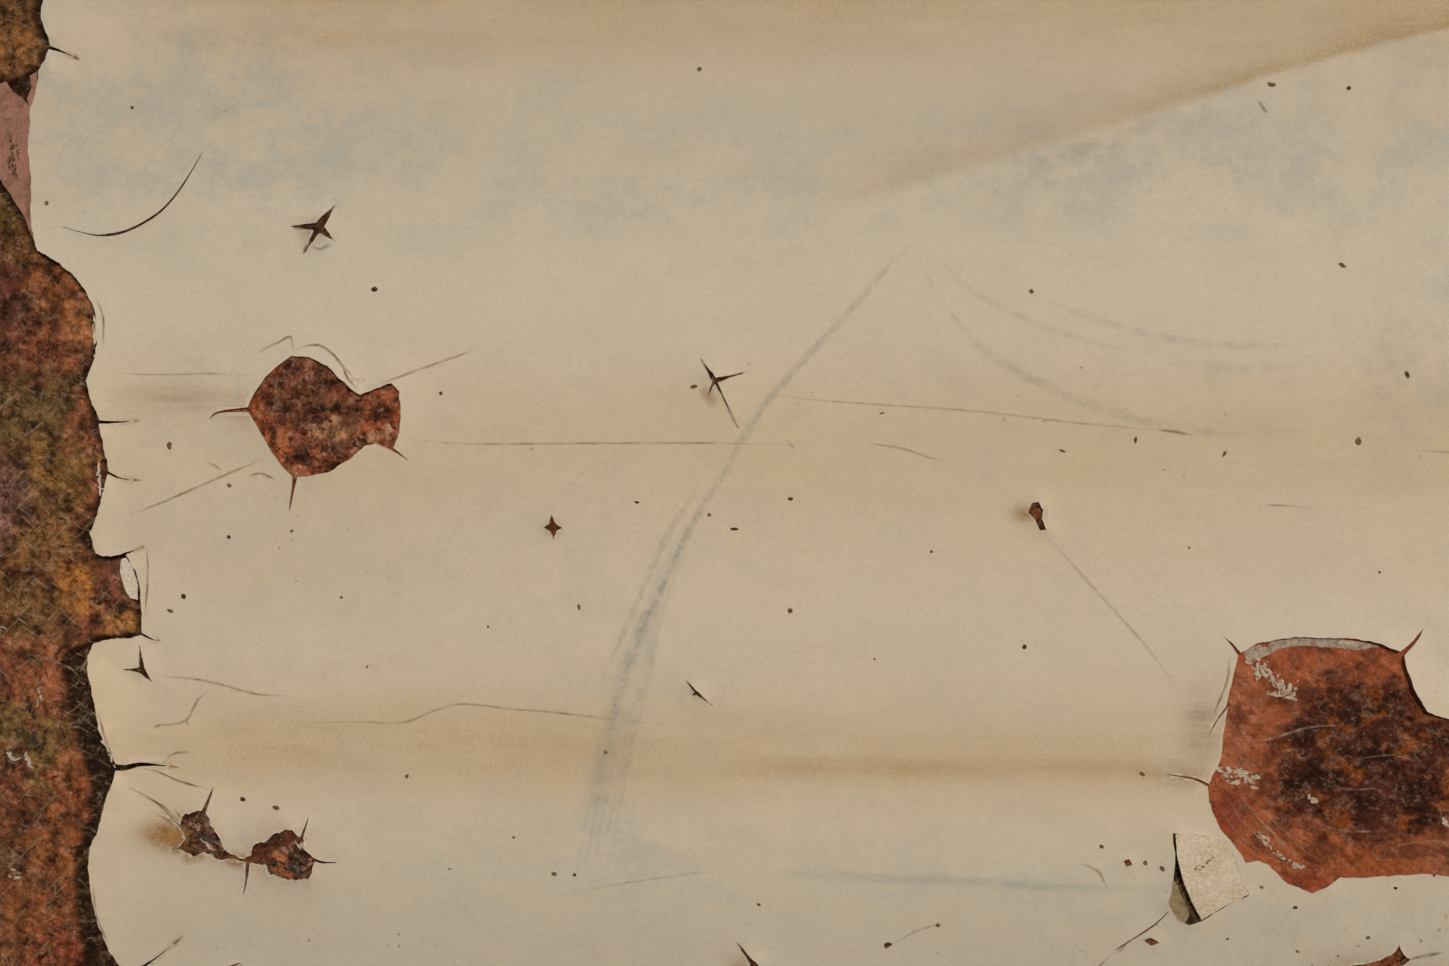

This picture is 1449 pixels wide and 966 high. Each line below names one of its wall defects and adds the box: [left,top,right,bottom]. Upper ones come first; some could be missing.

crack [265,178,360,279]
crack [672,330,775,456]
peeling [0,0,444,966]
peeling [1009,484,1065,548]
peeling [1112,584,1449,966]
crack [706,914,794,966]